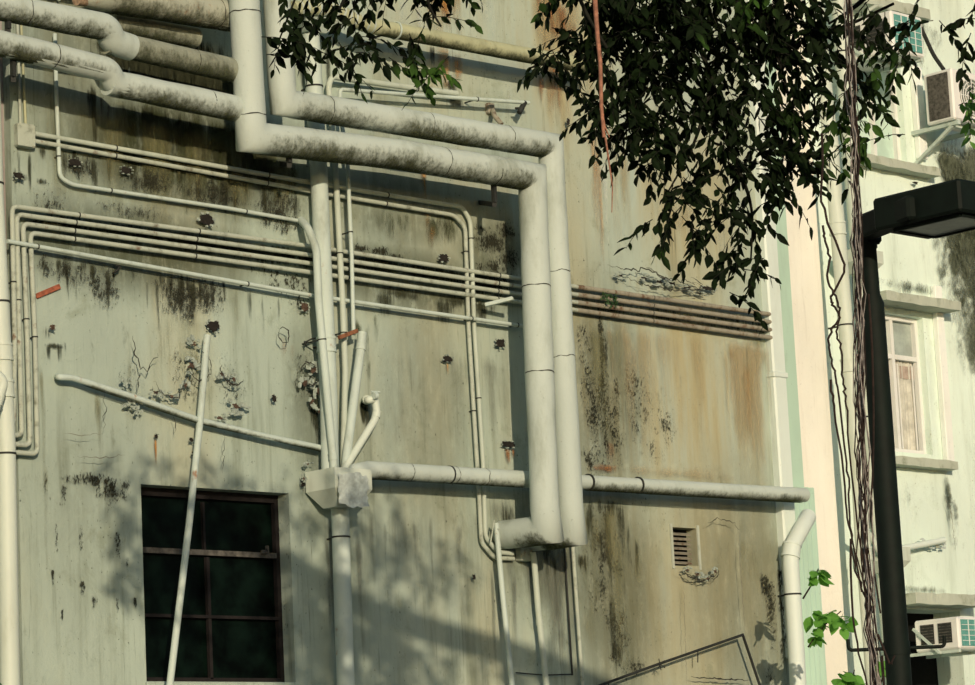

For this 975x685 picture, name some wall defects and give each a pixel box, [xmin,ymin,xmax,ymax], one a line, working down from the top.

leakage [0,10,106,46]
leakage [87,0,552,234]
leakage [19,148,314,308]
spalling [206,319,221,334]
leakage [354,222,519,321]
peeling [640,275,718,296]
leakage [935,230,975,370]
peeling [120,377,143,415]
crack [132,338,188,433]
peeling [214,399,251,423]
peeling [298,361,320,413]
leakage [518,303,803,684]